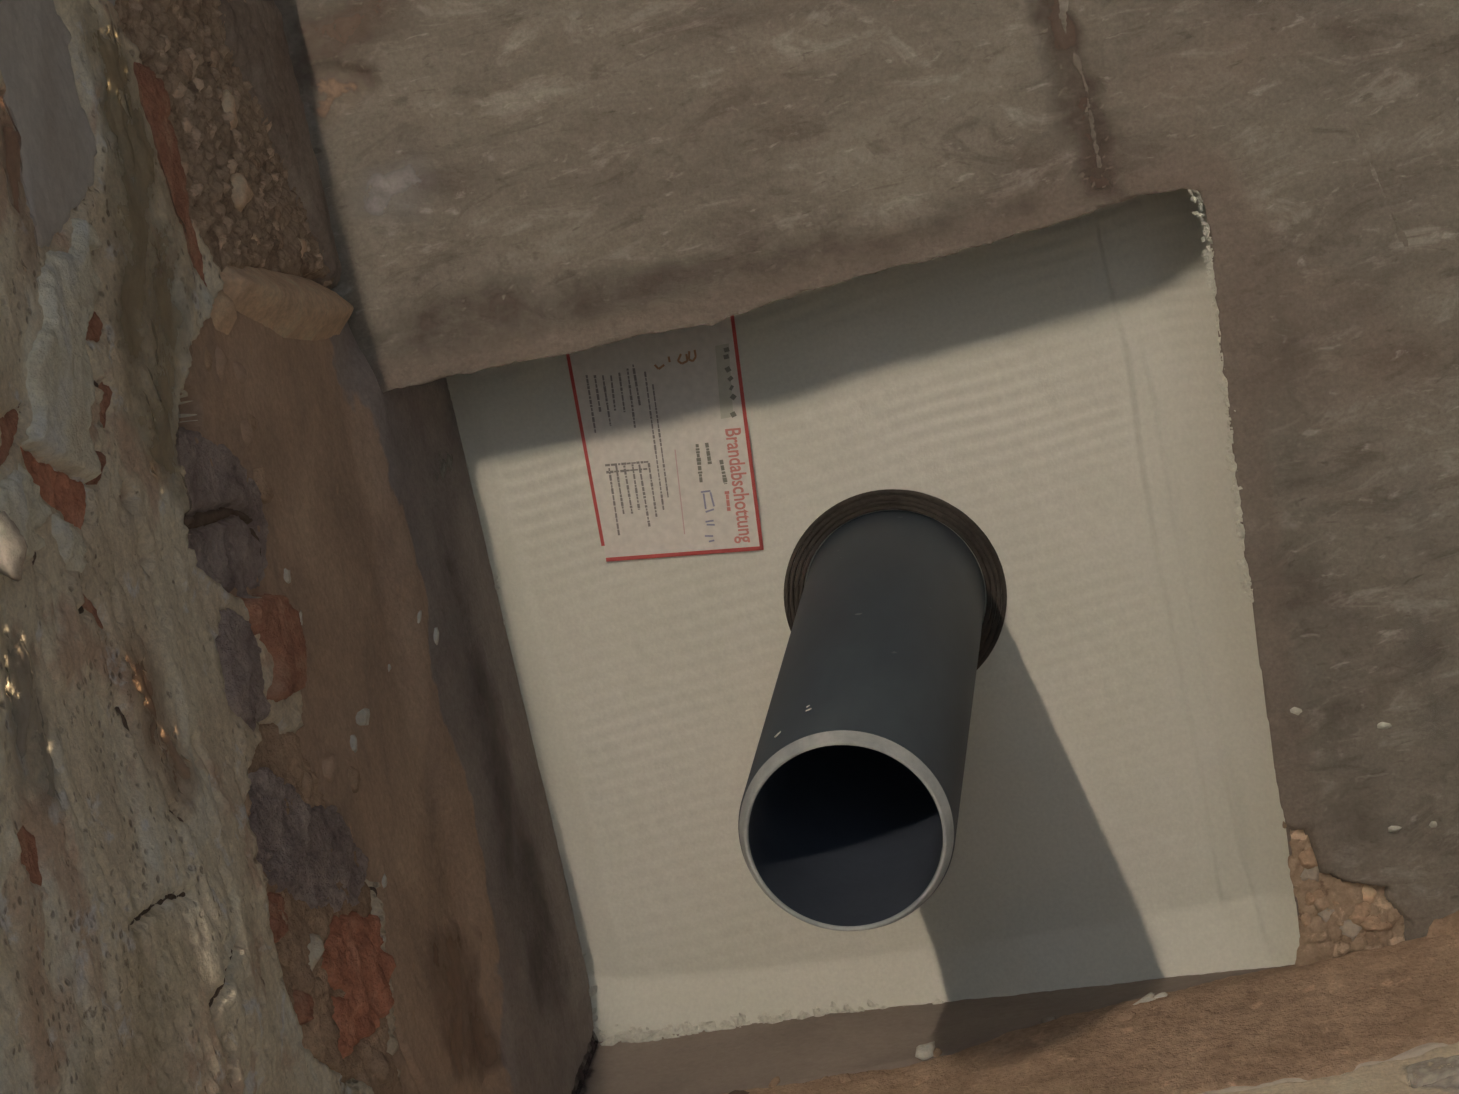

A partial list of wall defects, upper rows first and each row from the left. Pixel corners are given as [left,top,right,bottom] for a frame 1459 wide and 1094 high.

spalling [133,62,223,291]
crack [1059,0,1102,176]
flaking render [175,311,594,1094]
flaking render [722,821,1459,1094]